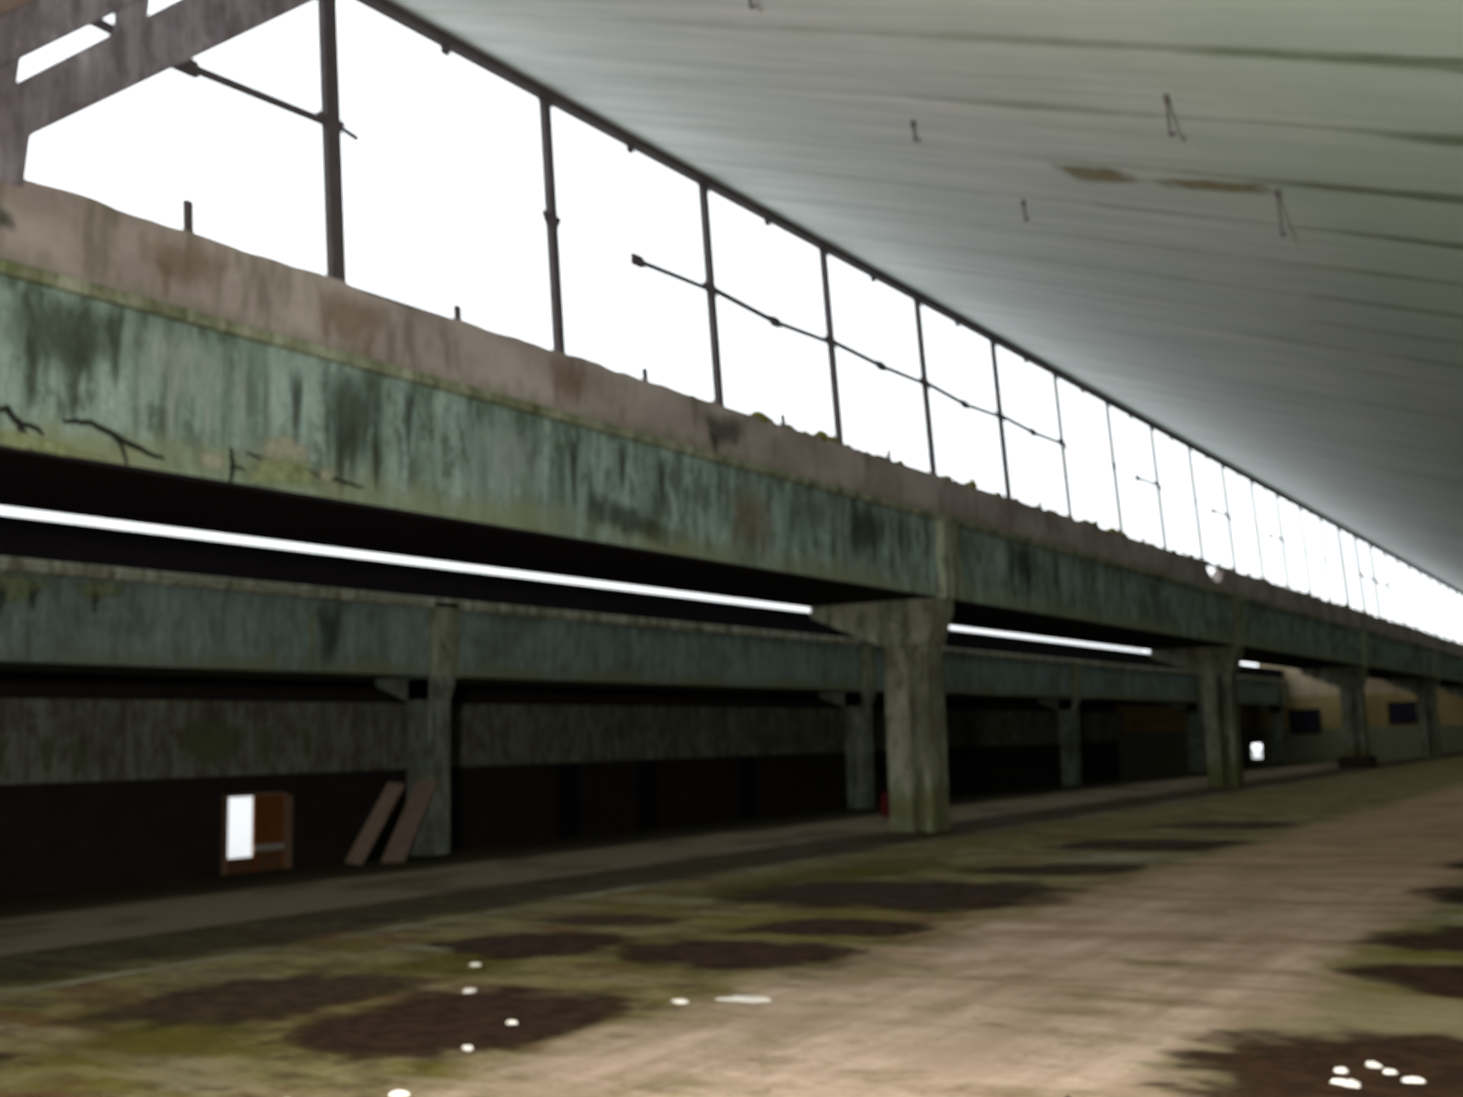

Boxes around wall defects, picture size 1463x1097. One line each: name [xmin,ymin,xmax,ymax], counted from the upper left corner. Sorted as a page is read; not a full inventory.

leakage [28,305,120,401]
crack [0,405,164,465]
leakage [293,384,301,427]
leakage [337,386,379,481]
leakage [708,417,738,450]
leakage [602,505,667,537]